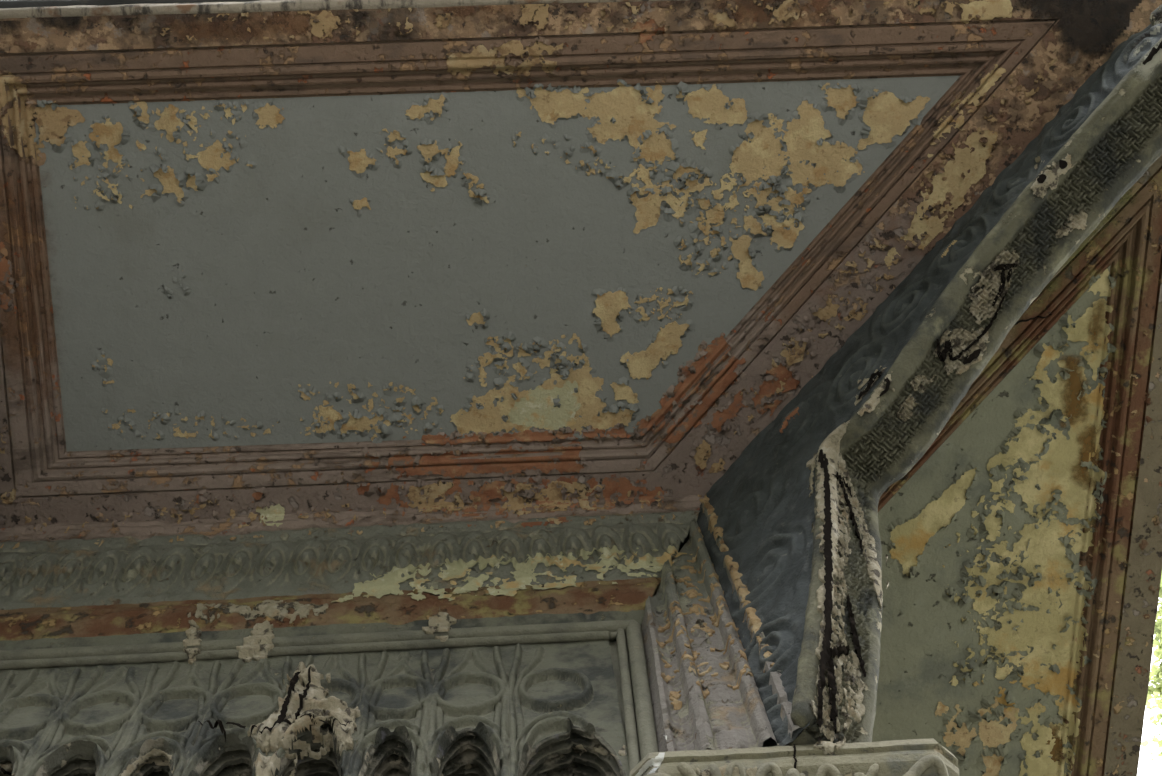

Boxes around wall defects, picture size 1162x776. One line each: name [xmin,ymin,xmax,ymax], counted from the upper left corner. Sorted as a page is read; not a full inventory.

peeling [0,70,285,211]
water stain [1019,0,1162,76]
peeling [194,0,1058,540]
peeling [183,494,775,710]
crack [793,449,866,769]
peeling [806,250,1124,776]
spalling [247,662,361,776]
spalling [635,736,667,776]